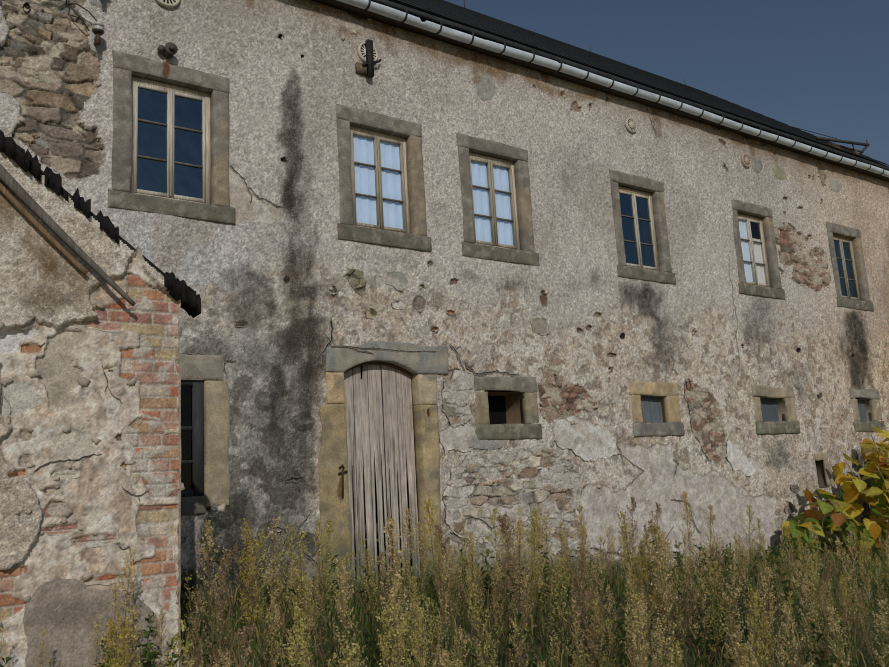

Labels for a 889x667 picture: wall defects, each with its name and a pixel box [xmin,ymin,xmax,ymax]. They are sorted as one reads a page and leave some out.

spalling [0,0,106,180]
crack [229,165,284,208]
leakage [279,76,326,394]
spalling [774,195,832,293]
crack [101,365,123,404]
leakage [842,312,871,390]
crack [34,454,100,471]
flaking render [0,246,185,667]
flaking render [439,362,800,566]